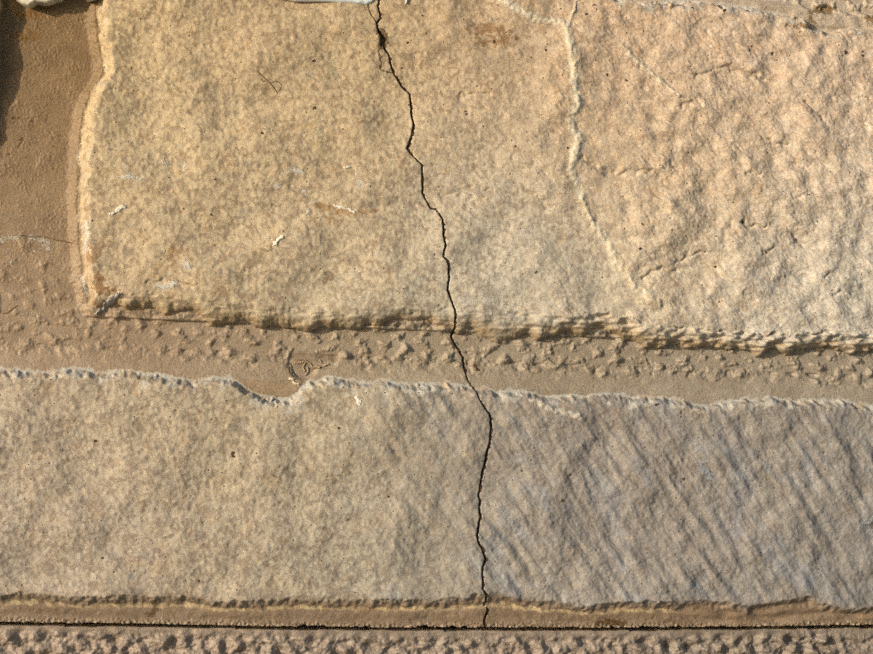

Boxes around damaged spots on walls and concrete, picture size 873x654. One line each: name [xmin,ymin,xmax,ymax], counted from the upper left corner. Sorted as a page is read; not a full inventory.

crack [368,0,493,629]